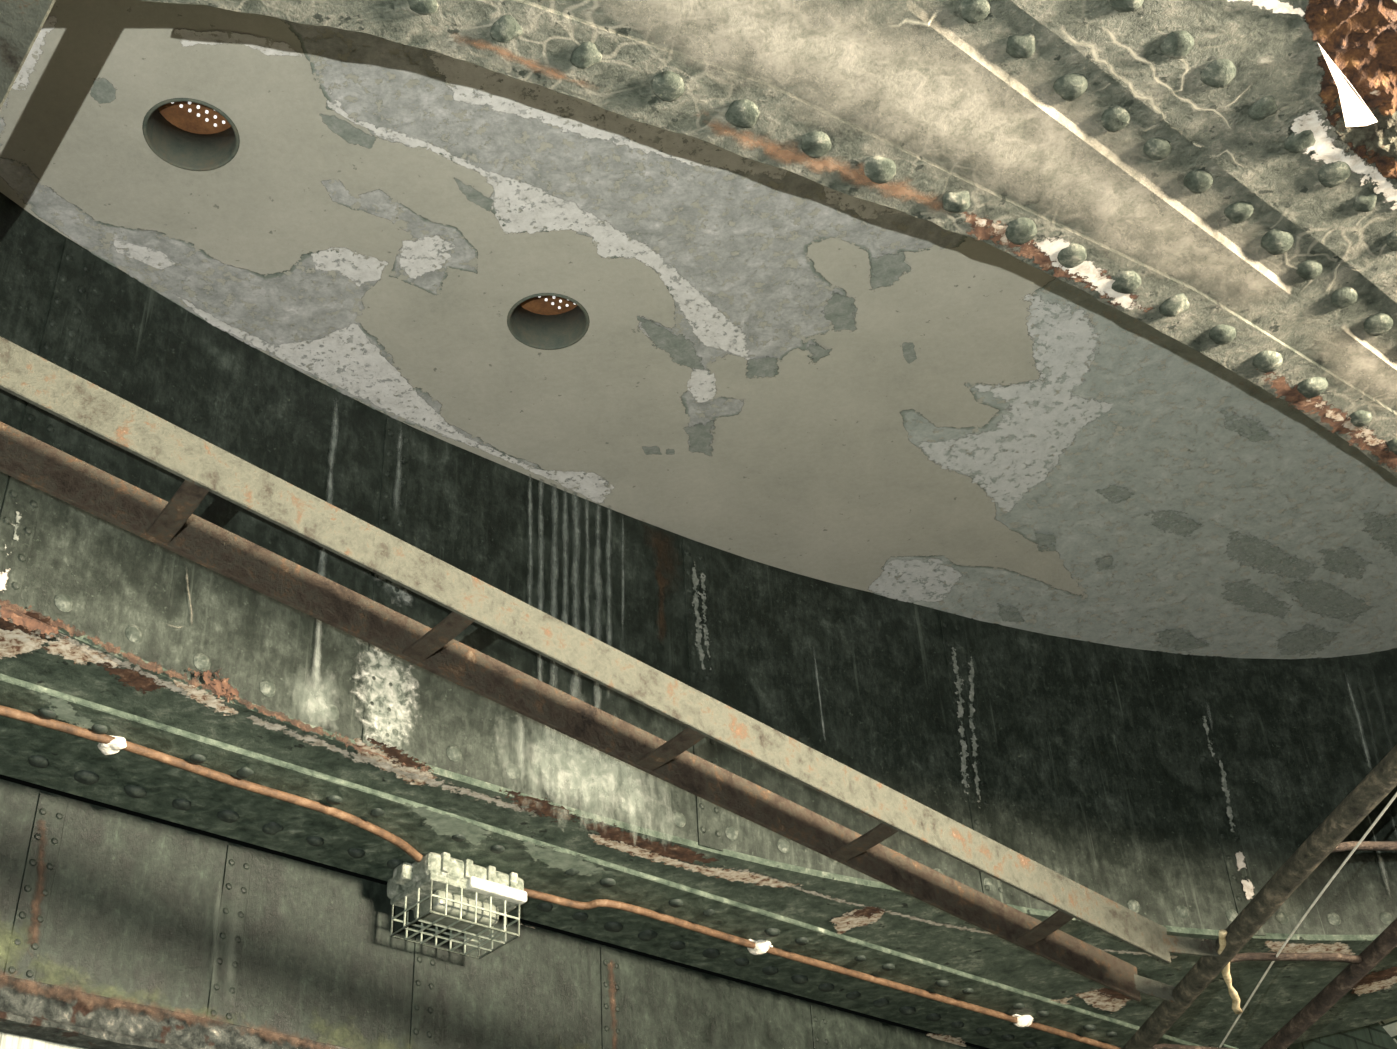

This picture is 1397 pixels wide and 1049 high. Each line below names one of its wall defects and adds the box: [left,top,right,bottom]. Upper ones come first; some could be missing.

peeling [0,16,615,503]
peeling [174,0,1397,659]
peeling [0,503,536,817]
damp [356,646,416,747]
peeling [400,803,492,846]
peeling [521,841,617,876]
damp [528,481,624,646]
damp [519,726,645,823]
damp [692,562,711,670]
spalling [724,866,993,935]
damp [951,647,981,808]
damp [1235,851,1255,900]